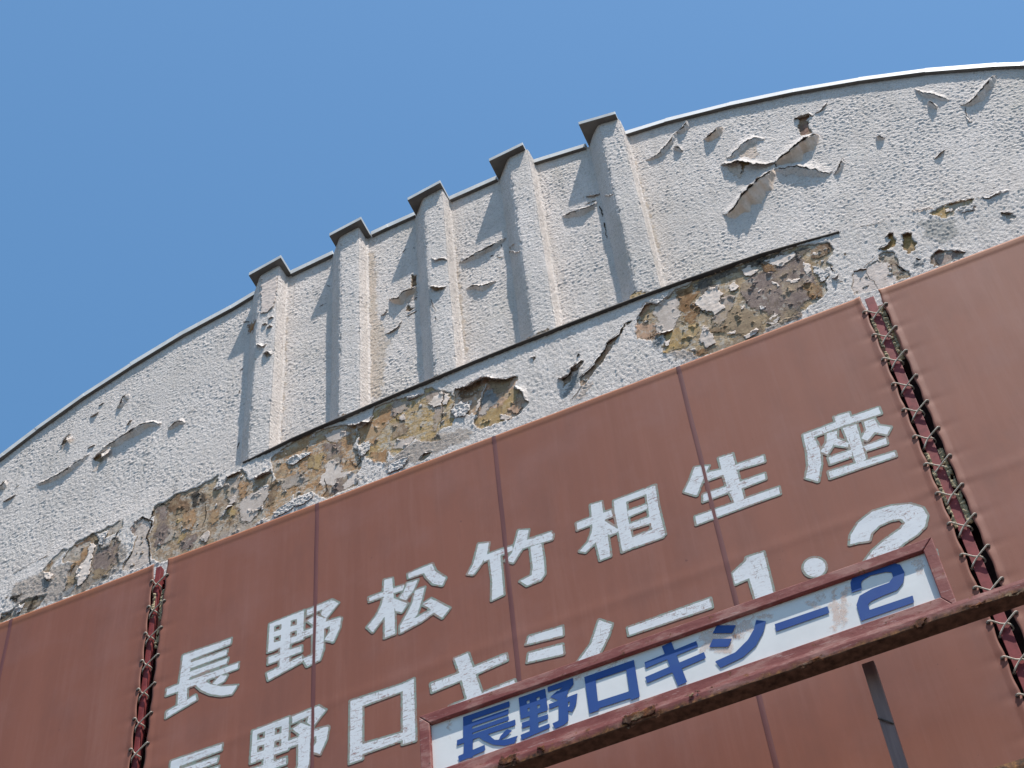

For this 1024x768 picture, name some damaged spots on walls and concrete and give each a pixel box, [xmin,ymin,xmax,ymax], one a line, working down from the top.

peeling [721,112,833,219]
spalling [382,276,418,316]
peeling [558,242,834,401]
peeling [852,232,916,294]
peeling [931,249,967,267]
peeling [0,374,529,622]